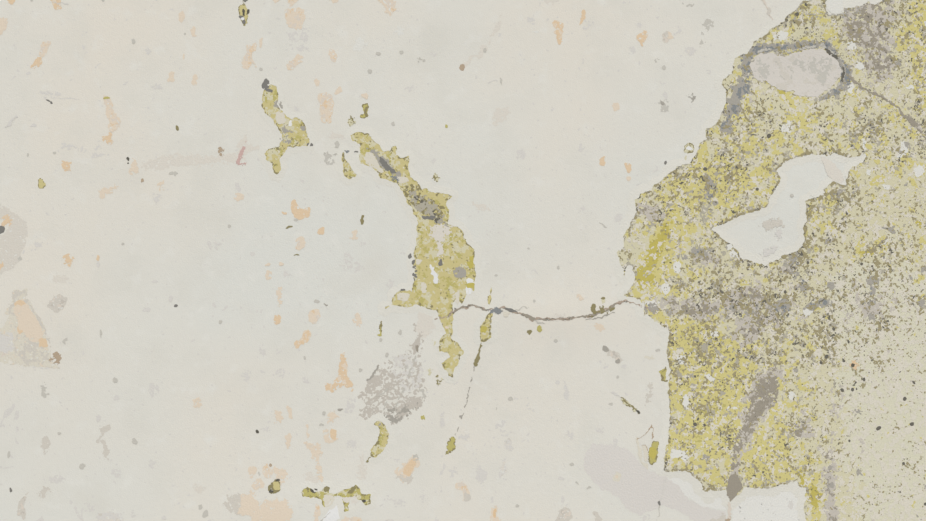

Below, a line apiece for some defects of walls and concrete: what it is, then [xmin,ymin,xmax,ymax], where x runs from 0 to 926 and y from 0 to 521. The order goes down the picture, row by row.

peeling [255,77,342,183]
peeling [334,103,499,385]
crack [434,284,655,324]
peeling [610,0,926,521]
crack [457,344,482,432]
peeling [237,411,377,521]